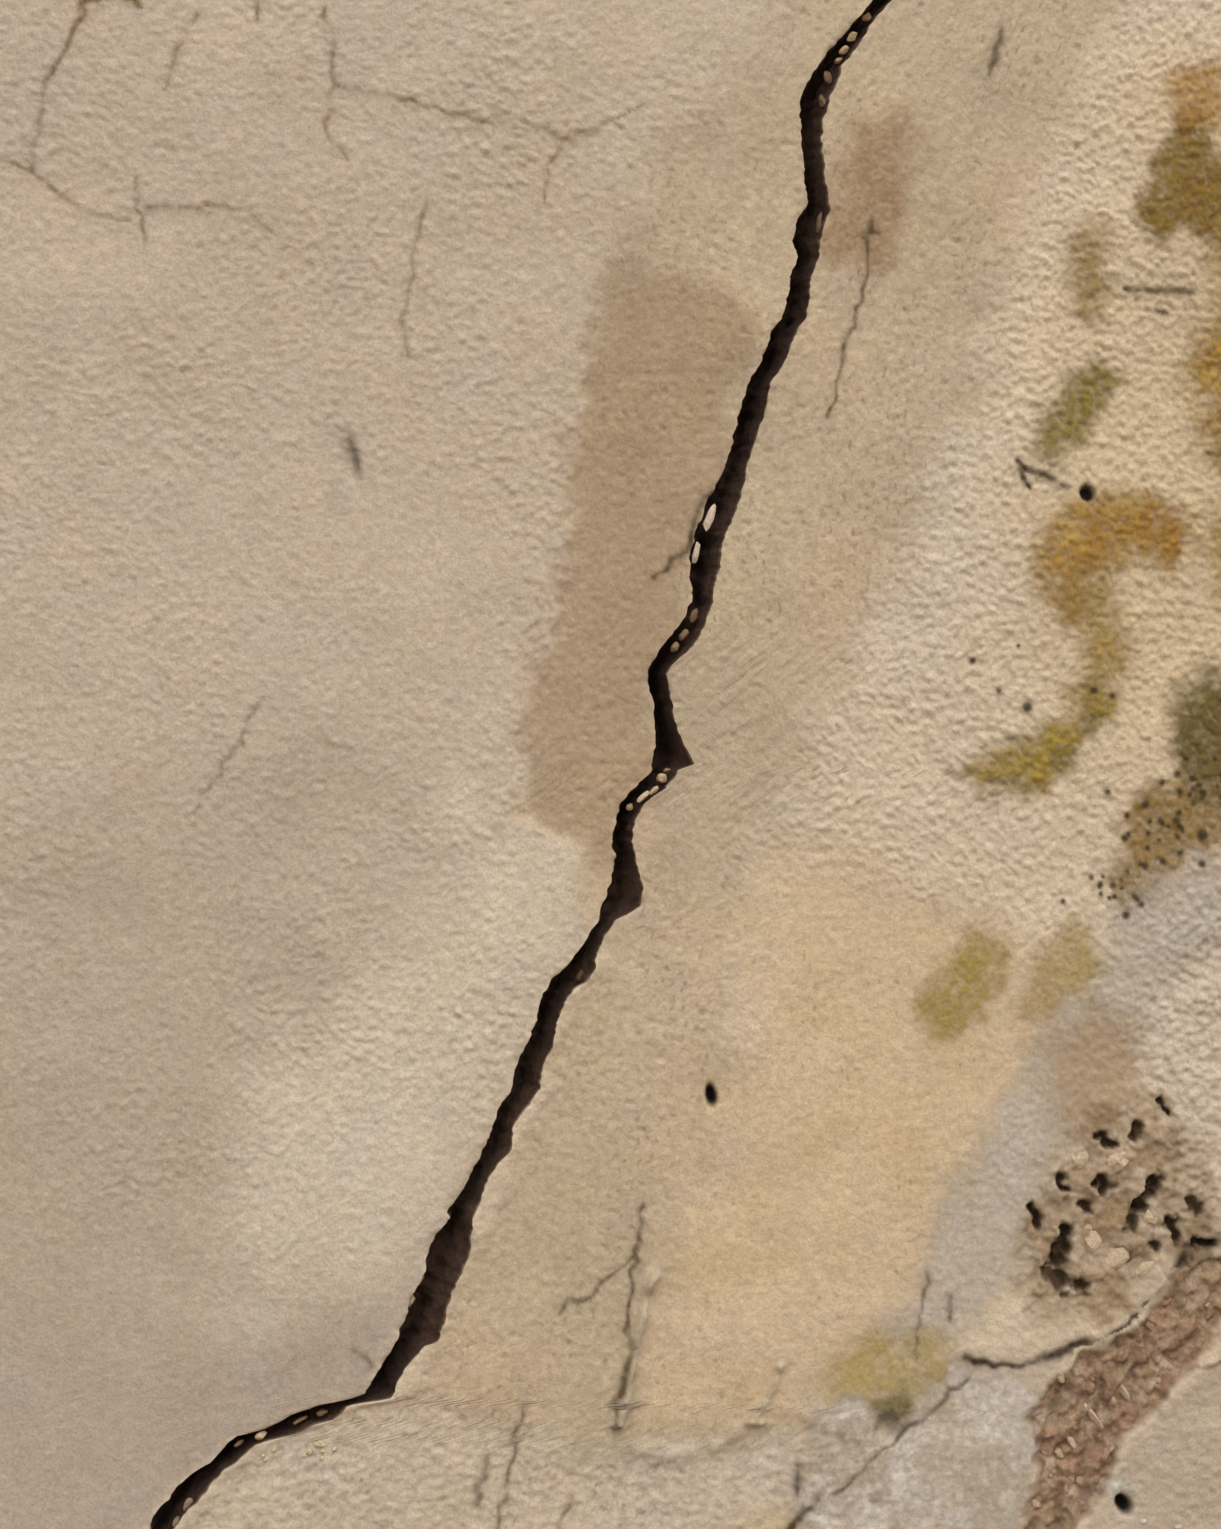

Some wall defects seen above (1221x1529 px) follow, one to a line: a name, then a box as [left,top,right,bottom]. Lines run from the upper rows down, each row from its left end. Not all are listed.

crack [52,0,142,72]
crack [991,30,1002,67]
damp [1138,67,1221,239]
damp [1044,365,1117,451]
damp [1192,329,1221,439]
damp [966,493,1185,792]
crack [150,0,892,1529]
flaking render [1024,1097,1213,1318]
spalling [1107,1478,1147,1524]